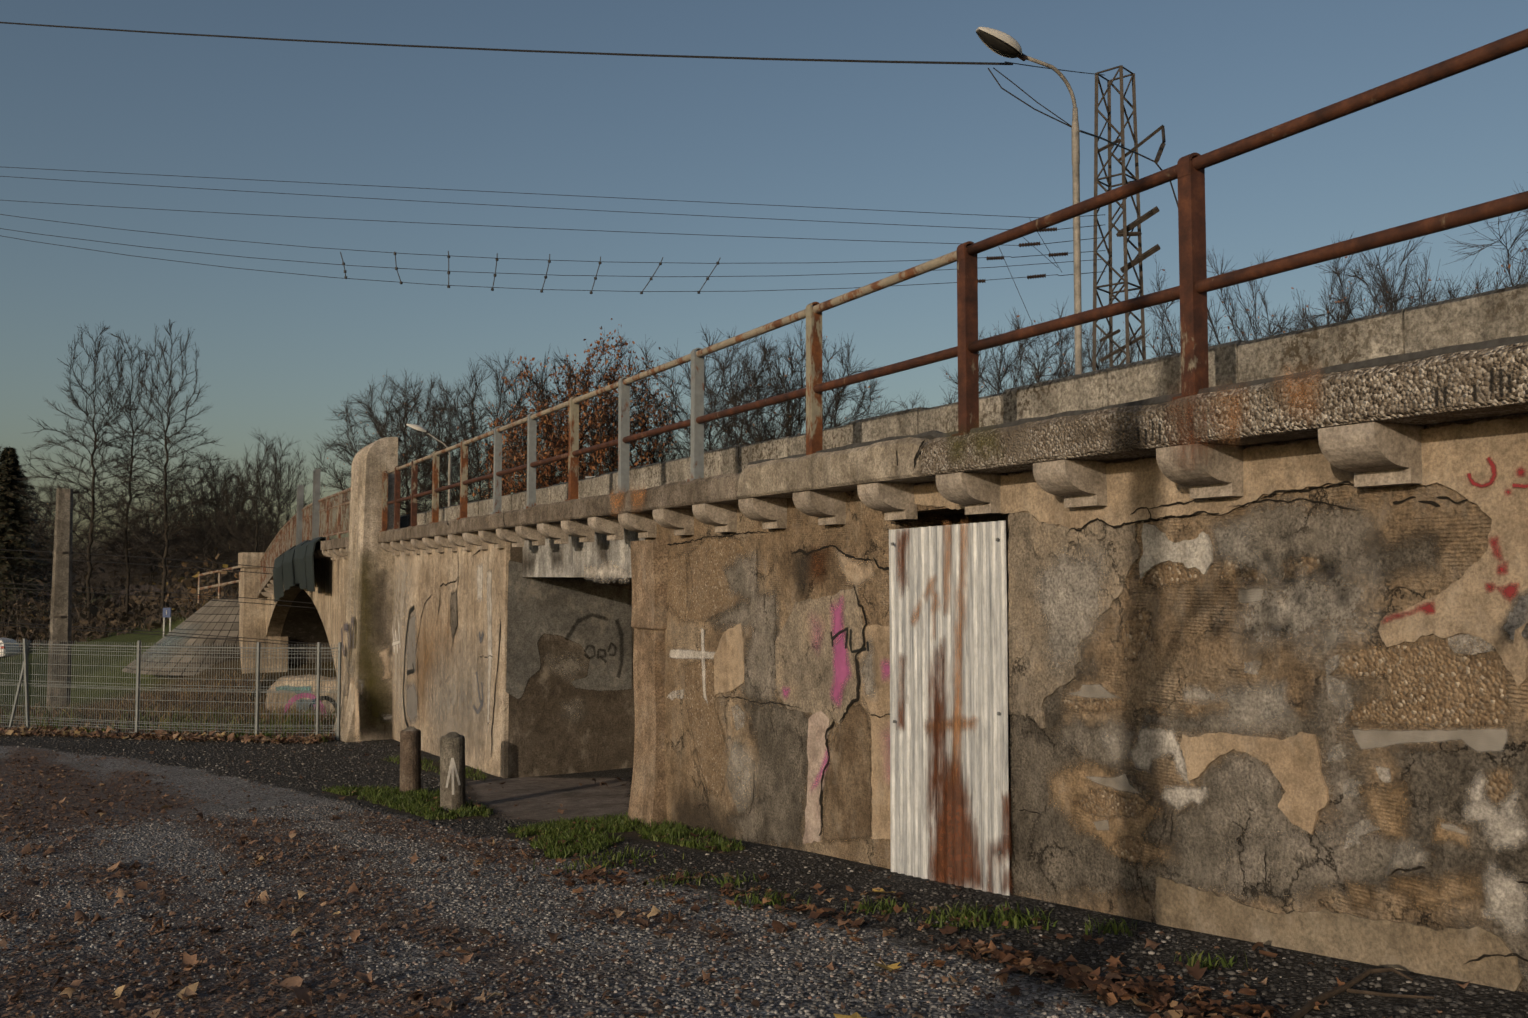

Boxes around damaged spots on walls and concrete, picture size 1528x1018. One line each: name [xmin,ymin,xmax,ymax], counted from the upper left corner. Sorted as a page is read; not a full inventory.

crack [1068,481,1360,532]
crack [1393,496,1467,507]
corrosion [897,532,909,585]
flaking render [1139,524,1266,588]
spalling [667,537,750,796]
crack [667,531,890,836]
flaking render [775,552,890,844]
corrosion [915,526,1011,891]
spalling [1326,634,1512,730]
spalling [1051,762,1168,868]
spalling [1343,766,1406,849]
spalling [1483,767,1512,806]